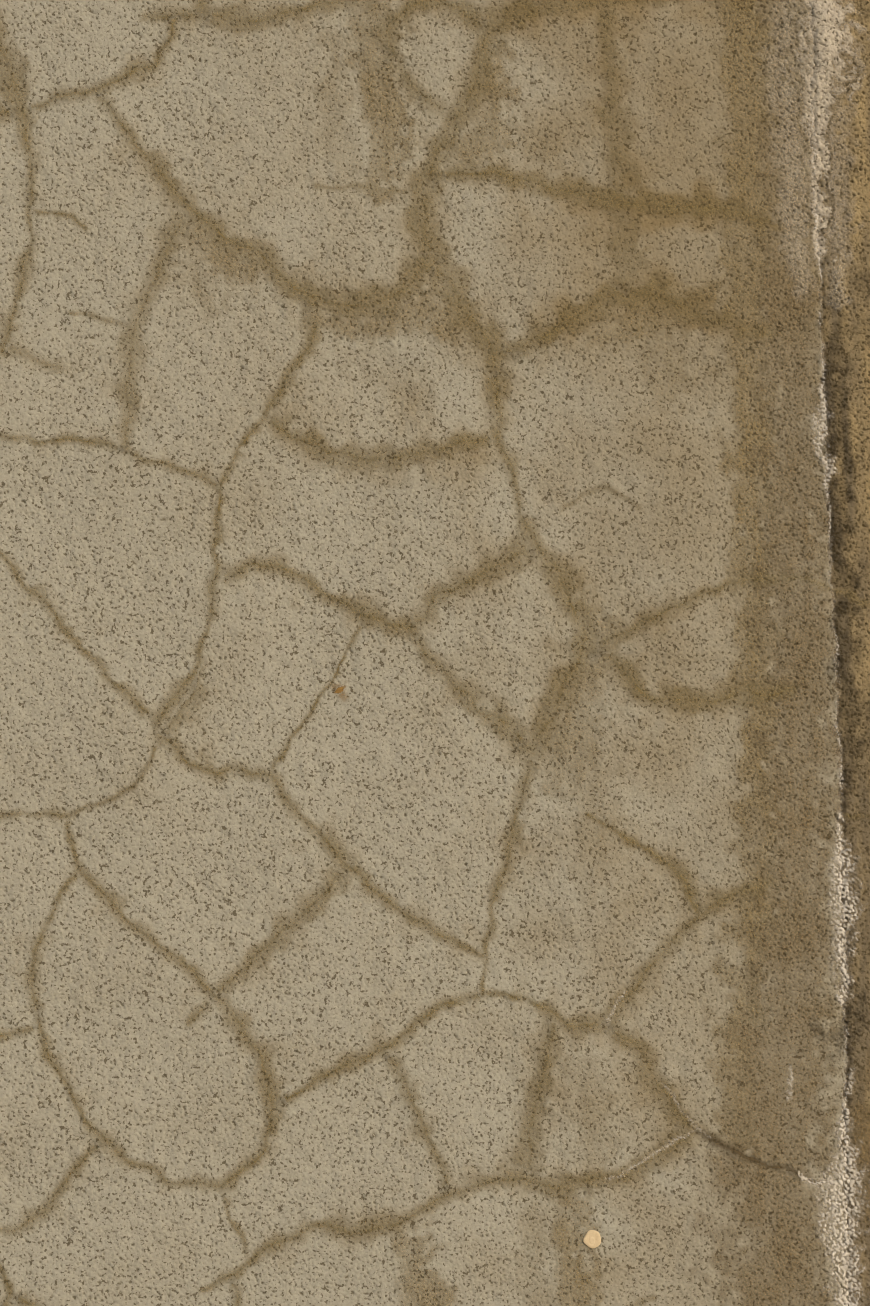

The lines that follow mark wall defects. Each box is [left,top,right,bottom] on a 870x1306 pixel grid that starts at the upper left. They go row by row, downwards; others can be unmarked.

crack [60,2,332,97]
leakage [797,0,862,279]
crack [119,122,771,477]
crack [214,476,427,657]
leakage [810,344,862,784]
crack [0,1024,135,1213]
crack [32,814,231,1023]
crack [113,609,345,799]
crack [162,837,634,1186]
crack [487,1087,822,1190]
leakage [724,1069,865,1306]
leakage [737,593,865,1049]